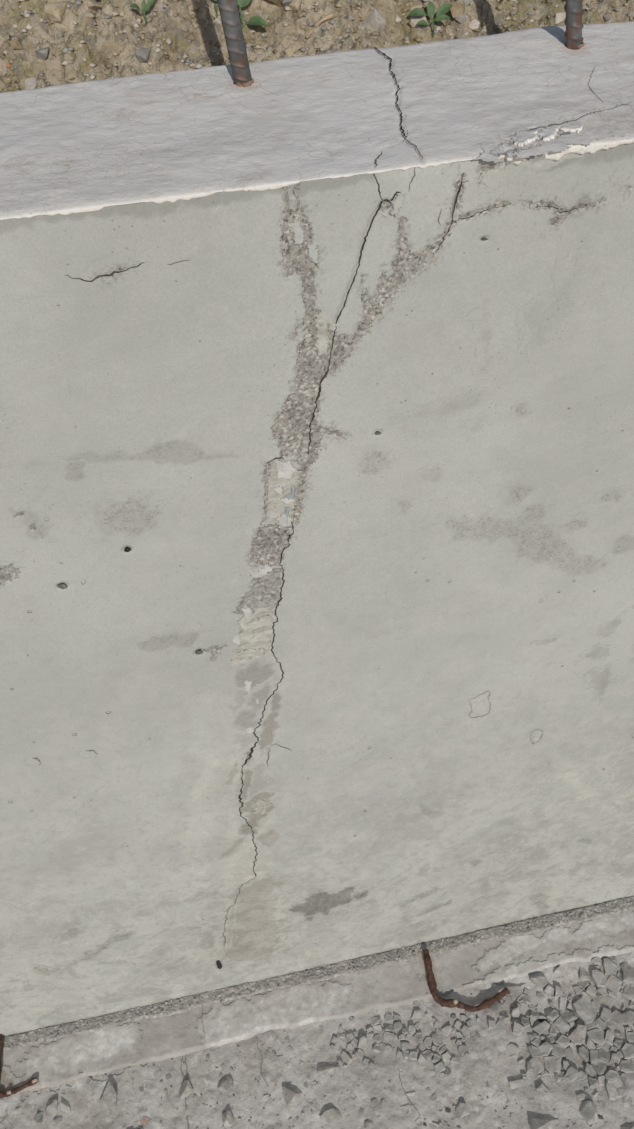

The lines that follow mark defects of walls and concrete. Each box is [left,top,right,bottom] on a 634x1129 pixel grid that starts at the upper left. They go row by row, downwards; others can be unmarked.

crack [508,67,629,137]
crack [435,174,622,252]
crack [66,249,188,298]
crack [308,46,423,455]
spalling [135,105,634,972]
crack [222,522,294,946]
leakage [280,885,373,923]
rust [415,948,444,998]
rust [0,1066,51,1093]